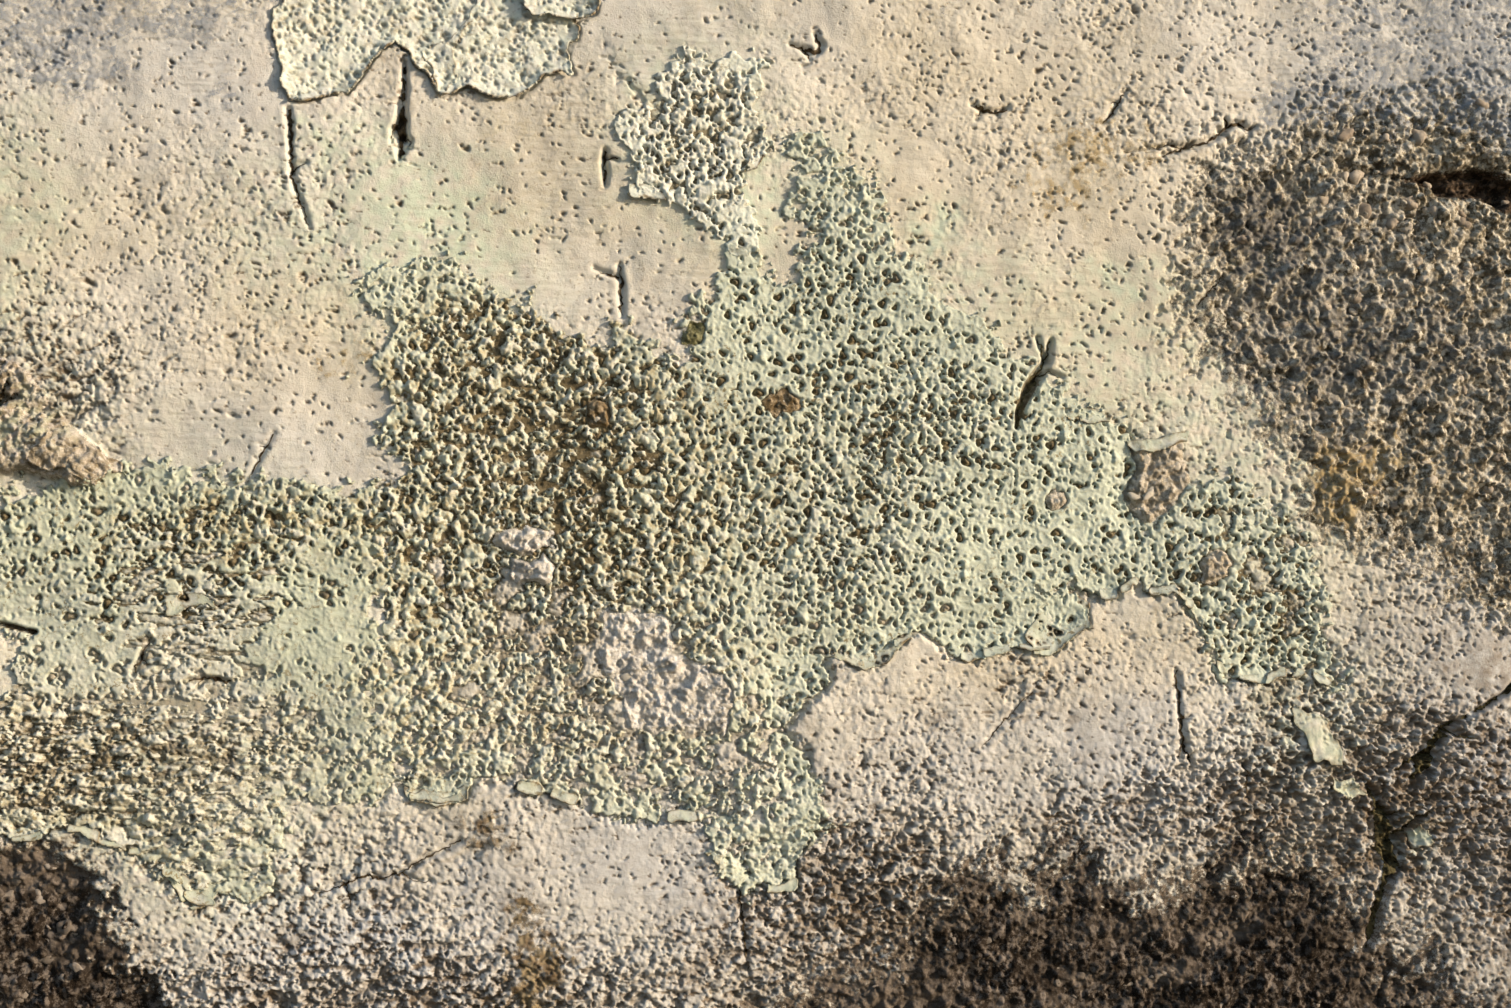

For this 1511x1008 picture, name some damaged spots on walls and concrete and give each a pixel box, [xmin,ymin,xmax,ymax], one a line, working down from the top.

peeling [270,0,601,101]
crack [287,109,309,225]
crack [391,67,411,157]
crack [1015,340,1061,429]
spalling [1163,79,1511,640]
peeling [354,45,1354,898]
crack [0,623,38,635]
peeling [0,456,403,1008]
leakage [1043,827,1145,905]
spalling [725,805,1498,1008]
leakage [1212,829,1263,865]
crack [1365,683,1511,948]